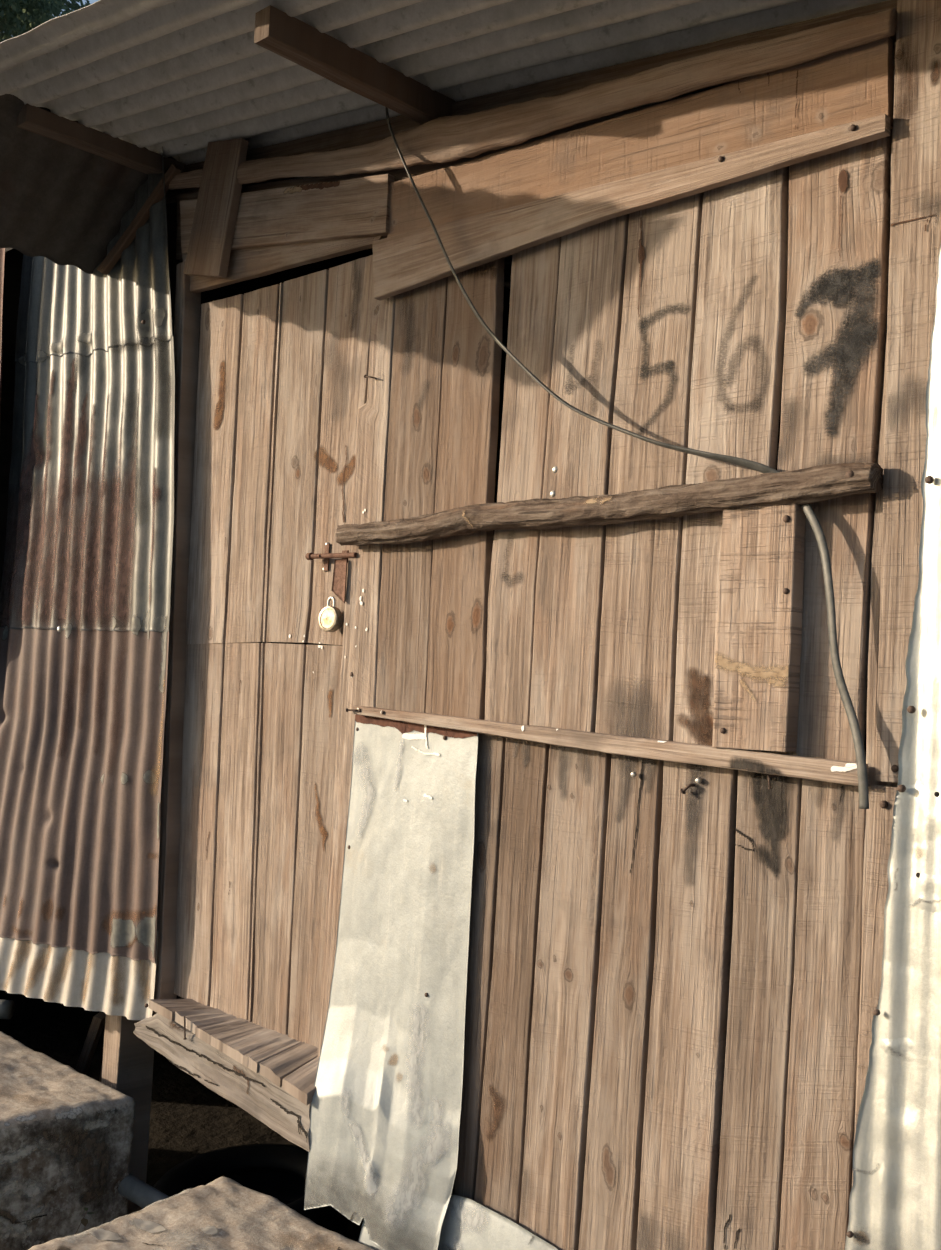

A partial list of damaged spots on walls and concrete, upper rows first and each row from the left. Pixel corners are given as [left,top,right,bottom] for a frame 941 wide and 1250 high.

rust [2,359,139,627]
rust [152,699,164,792]
leakage [678,670,713,746]
leakage [730,758,789,877]
rust [42,900,64,918]
rust [8,931,72,996]
rust [113,938,137,1003]
rust [139,960,149,997]
crack [145,1025,307,1138]